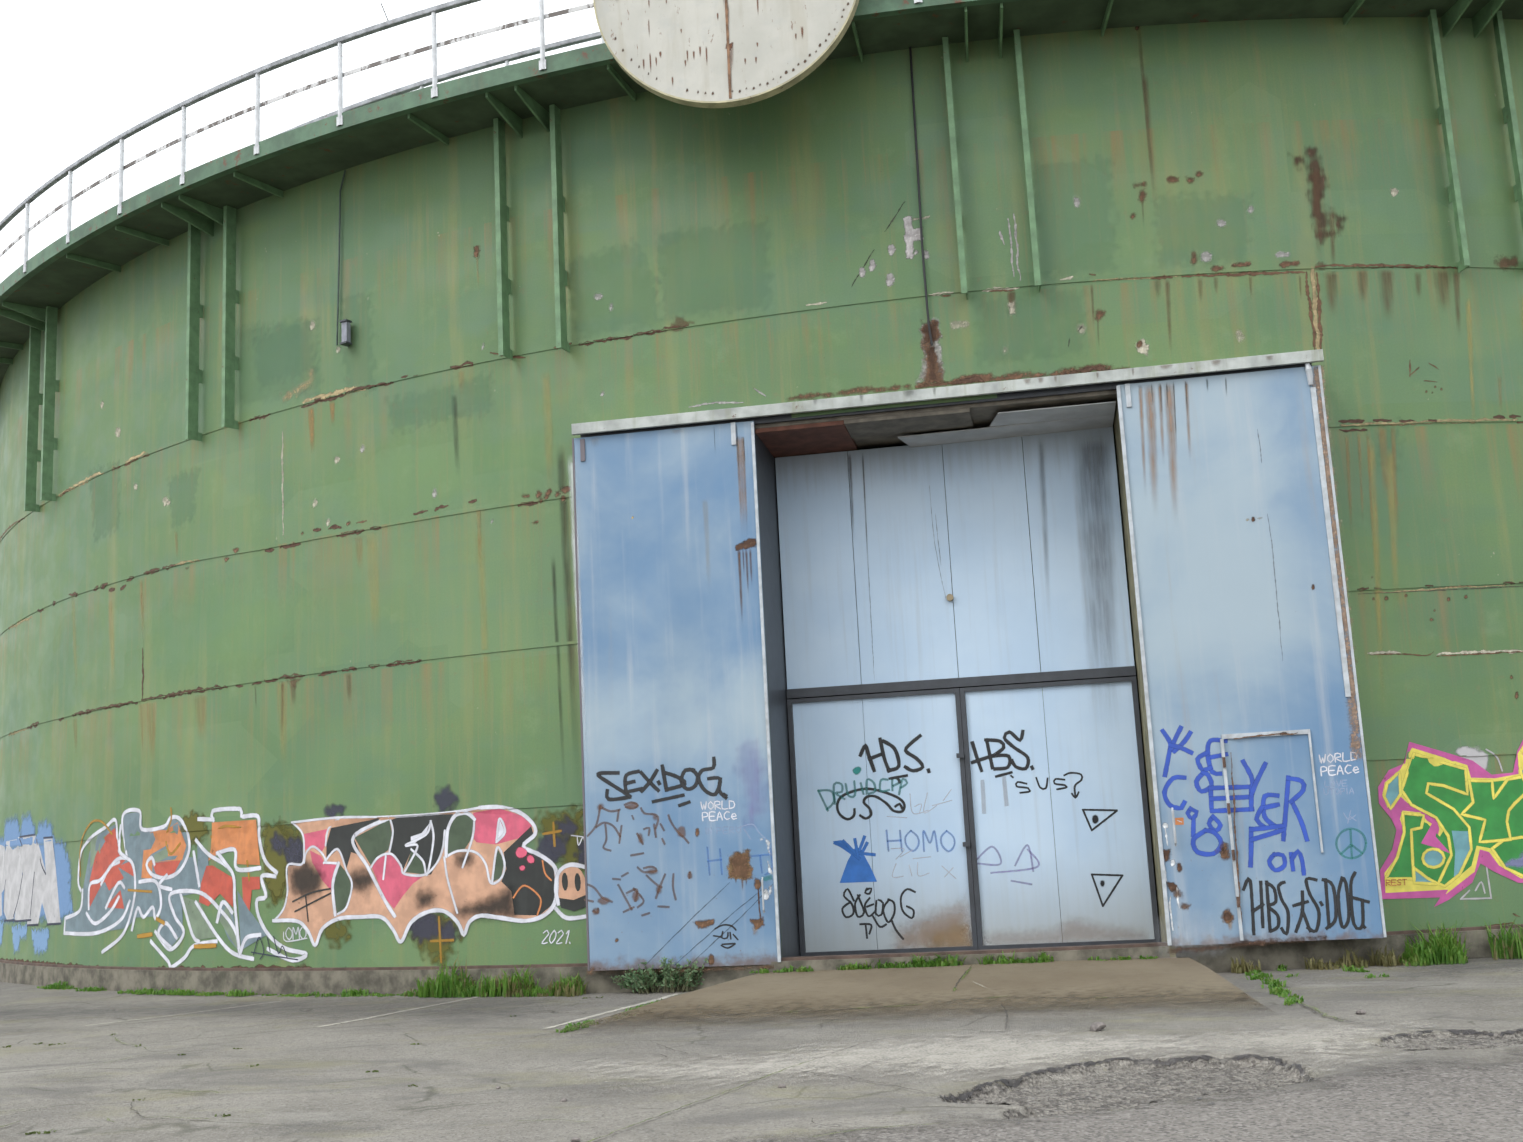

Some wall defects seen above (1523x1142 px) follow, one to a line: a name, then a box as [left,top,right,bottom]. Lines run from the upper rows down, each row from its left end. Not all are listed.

corrosion [1166,171,1202,182]
corrosion [1295,148,1344,243]
peeling [859,216,929,286]
corrosion [789,319,1127,400]
corrosion [301,375,417,439]
corrosion [265,520,381,552]
corrosion [518,486,571,524]
corrosion [1089,252,1523,759]
corrosion [9,559,200,630]
corrosion [59,648,422,721]
corrosion [1220,732,1297,924]
corrosion [727,850,764,929]